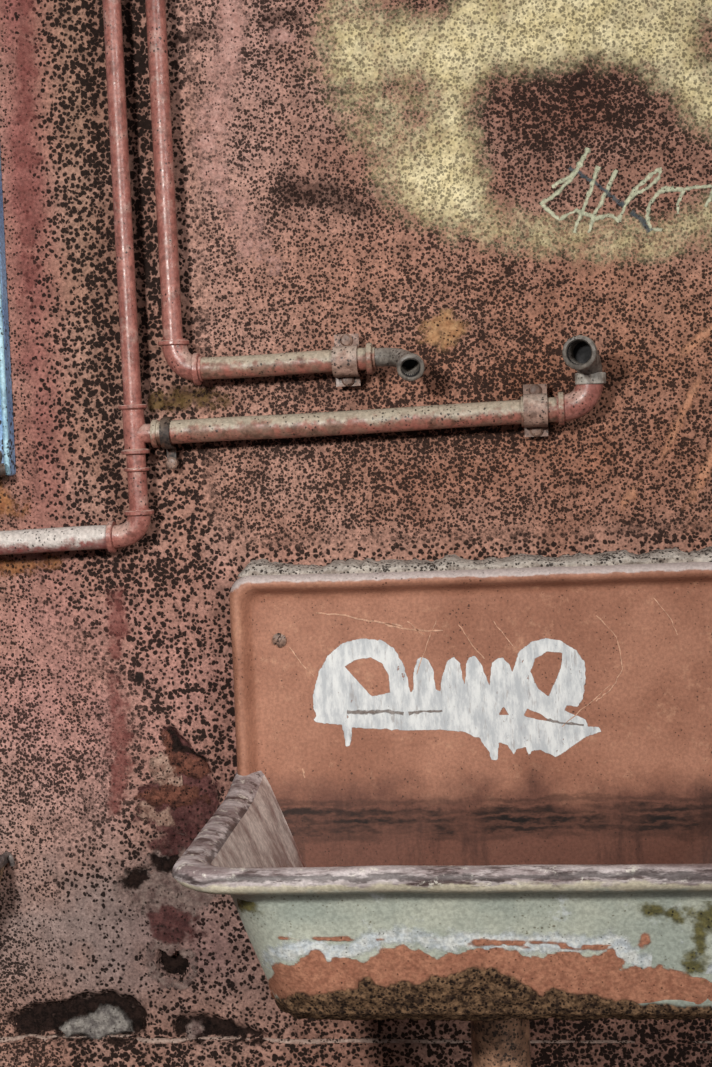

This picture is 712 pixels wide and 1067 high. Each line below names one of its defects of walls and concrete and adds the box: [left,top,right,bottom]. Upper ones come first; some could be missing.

rust [423,310,465,347]
rust [0,557,60,574]
flaking render [113,726,219,990]
flaking render [7,991,147,1046]